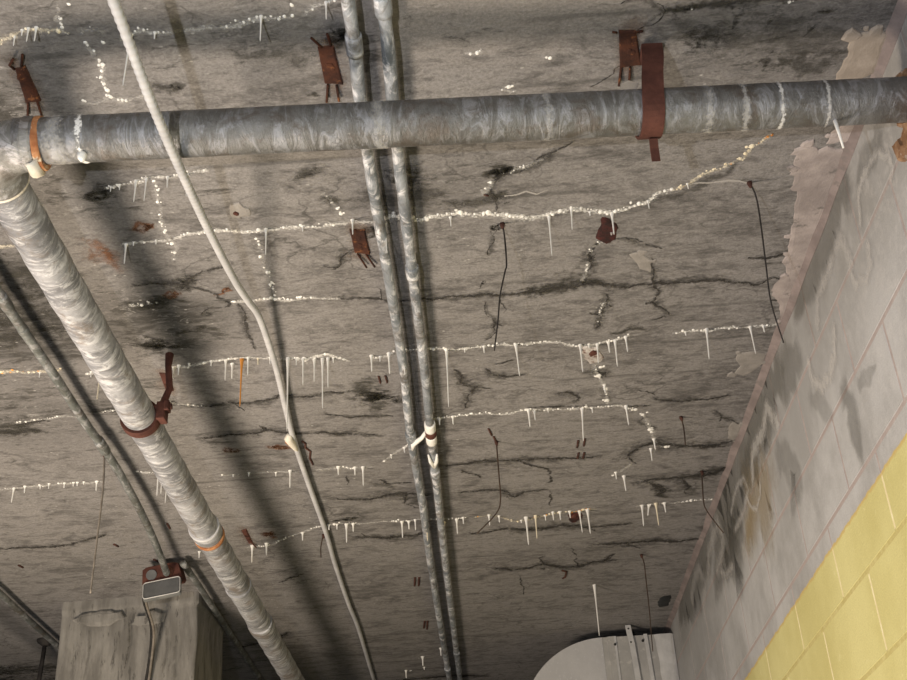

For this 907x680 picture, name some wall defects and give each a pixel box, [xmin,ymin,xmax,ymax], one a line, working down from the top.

peeling [841,25,883,42]
water stain [412,81,786,254]
spalling [892,123,907,162]
water stain [85,169,368,301]
crack [138,267,254,348]
crack [340,237,782,340]
crack [171,391,384,439]
water stain [286,353,348,427]
water stain [349,327,670,460]
crack [626,391,738,496]
water stain [477,508,591,545]
crack [446,457,698,595]